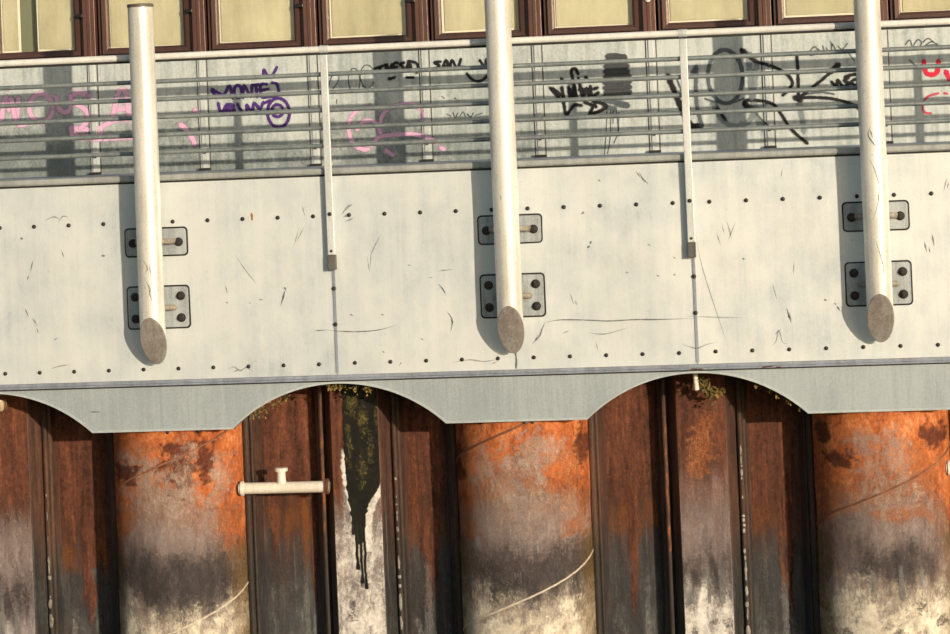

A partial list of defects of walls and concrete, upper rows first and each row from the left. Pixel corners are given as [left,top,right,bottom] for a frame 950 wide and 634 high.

water stain [0,578,29,634]
rust [57,409,246,624]
water stain [117,544,250,634]
rust [261,384,345,601]
water stain [335,486,387,634]
water stain [417,580,433,634]
rust [404,397,591,613]
water stain [460,534,597,634]
rust [604,368,727,610]
rust [747,380,801,612]
rust [812,410,950,539]
water stain [817,529,950,634]